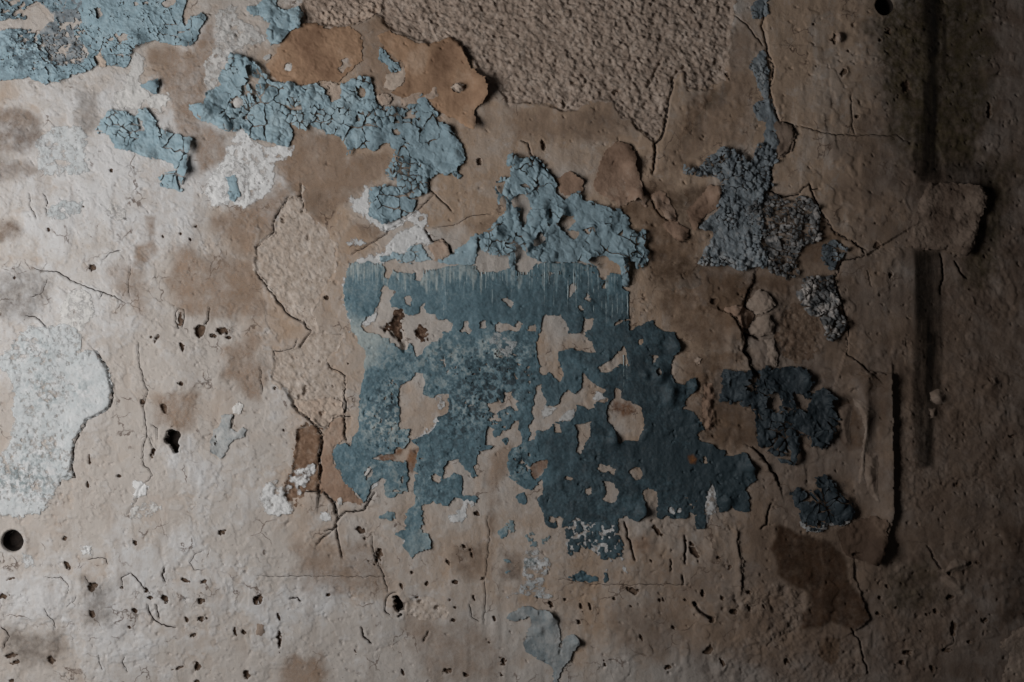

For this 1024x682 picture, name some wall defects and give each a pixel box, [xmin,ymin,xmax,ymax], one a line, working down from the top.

peeling [0,0,206,85]
peeling [95,108,193,192]
crack [256,184,304,248]
spalling [189,0,737,224]
crack [652,63,674,173]
crack [736,16,910,372]
crack [257,274,312,391]
peeling [252,50,848,583]
peeling [789,474,889,566]
damp [771,526,870,629]
peeling [492,598,592,682]